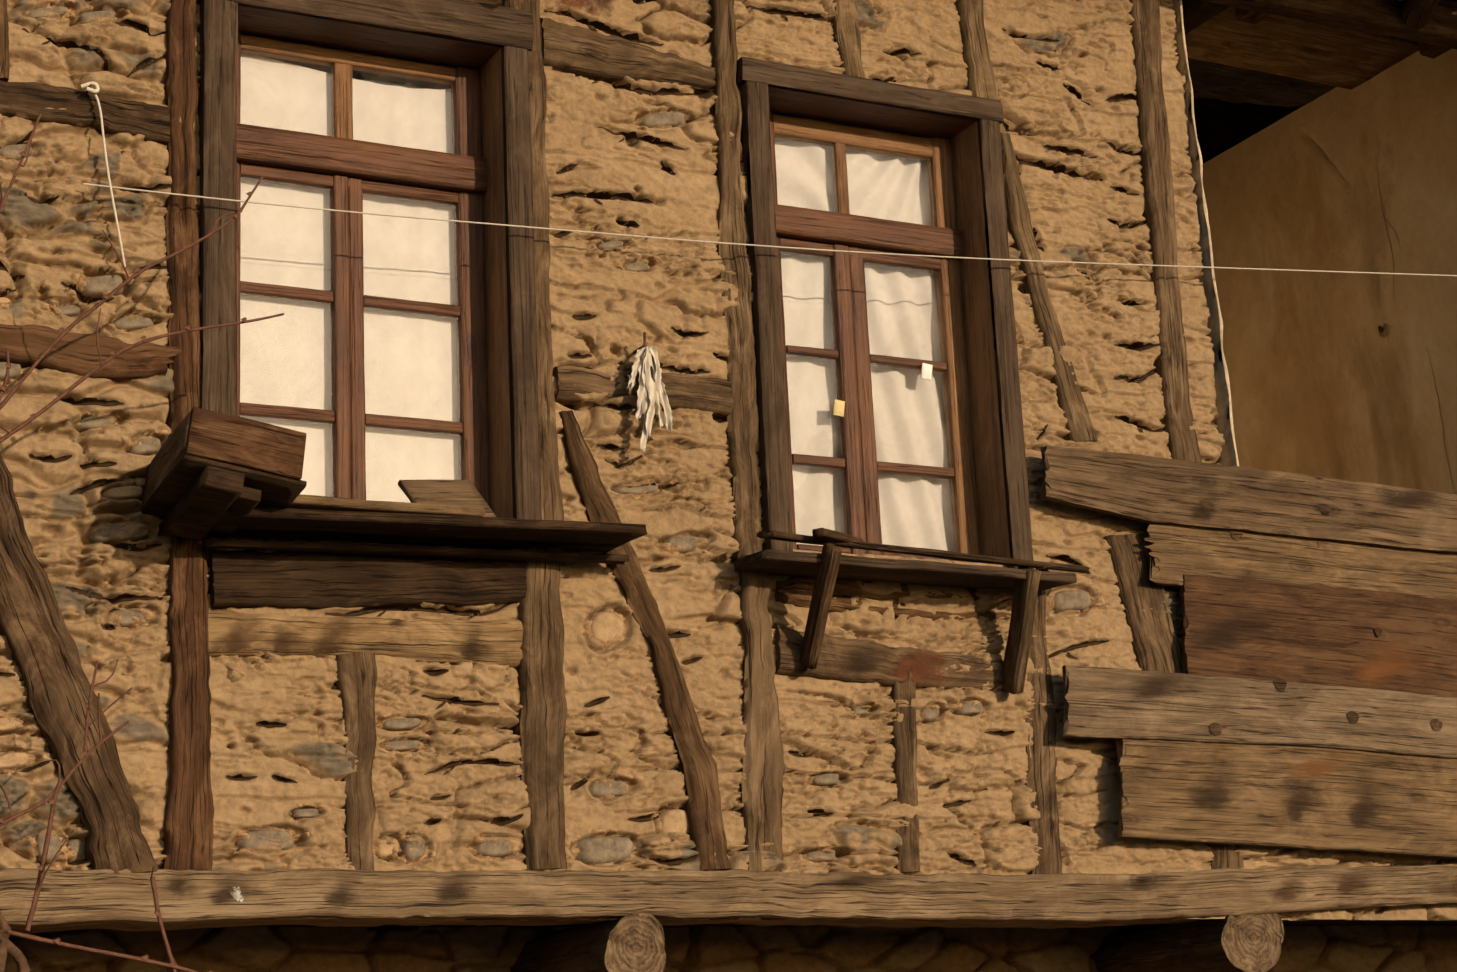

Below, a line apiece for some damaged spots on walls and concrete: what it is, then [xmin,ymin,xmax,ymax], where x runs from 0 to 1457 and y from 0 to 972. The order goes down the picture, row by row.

crack [1427,348,1456,494]